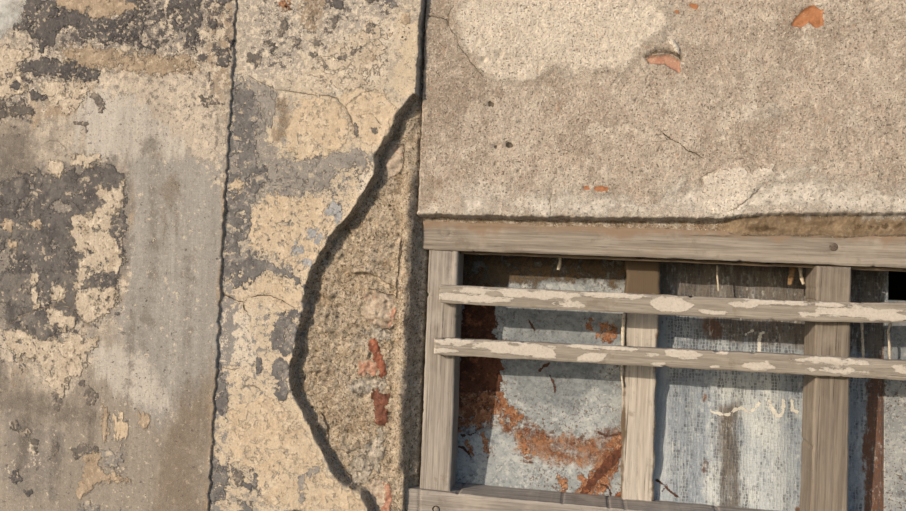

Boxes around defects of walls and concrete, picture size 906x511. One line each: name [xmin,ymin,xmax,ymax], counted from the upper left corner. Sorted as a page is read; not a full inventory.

spalling [791,5,824,28]
spalling [645,39,681,73]
spalling [0,0,429,511]
corrosion [461,304,499,340]
corrosion [584,317,621,344]
corrosion [458,356,622,497]